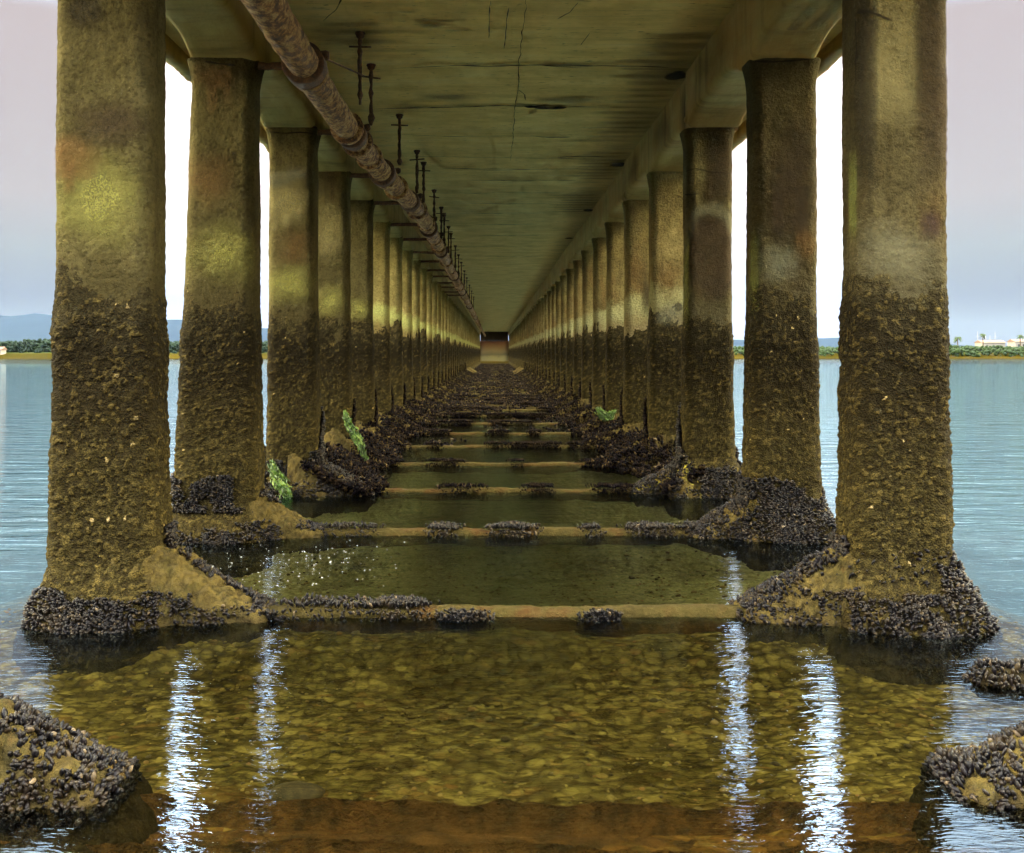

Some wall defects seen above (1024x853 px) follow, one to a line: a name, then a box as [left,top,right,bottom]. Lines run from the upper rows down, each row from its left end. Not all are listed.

crack [377,0,669,257]